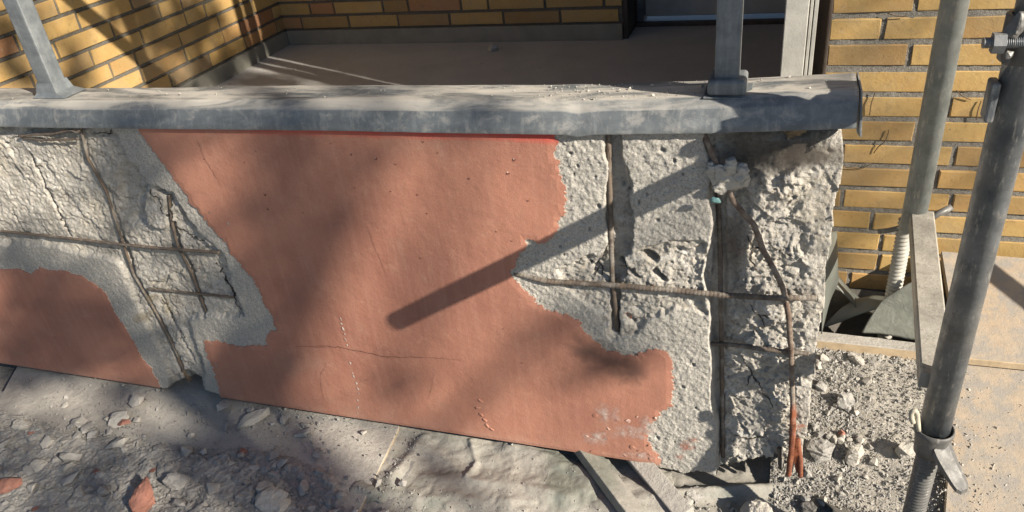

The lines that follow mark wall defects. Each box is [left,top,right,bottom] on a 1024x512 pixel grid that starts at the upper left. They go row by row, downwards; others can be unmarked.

spalling [0,127,276,395]
spalling [511,129,844,476]